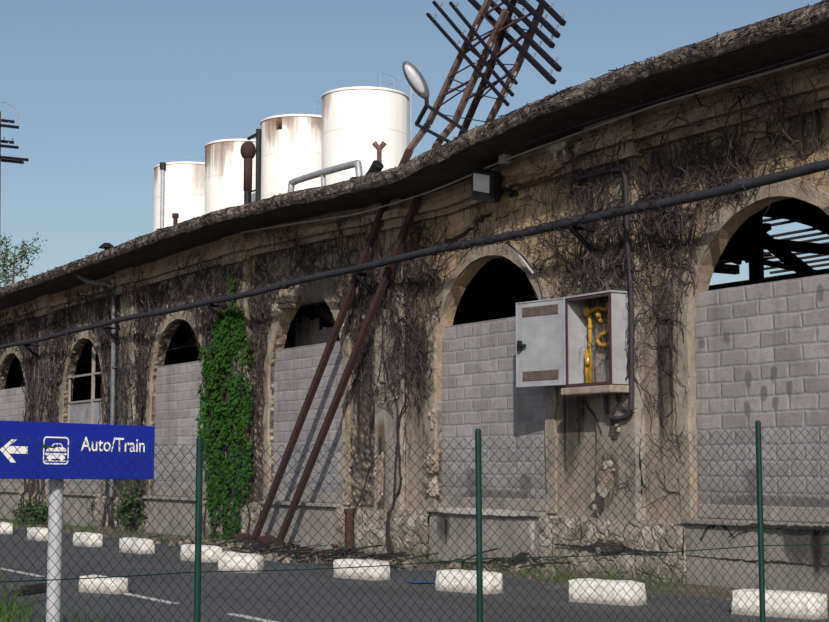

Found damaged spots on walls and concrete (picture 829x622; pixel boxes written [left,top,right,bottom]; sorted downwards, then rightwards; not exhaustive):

spalling [590,460,615,516]
spalling [589,537,629,554]